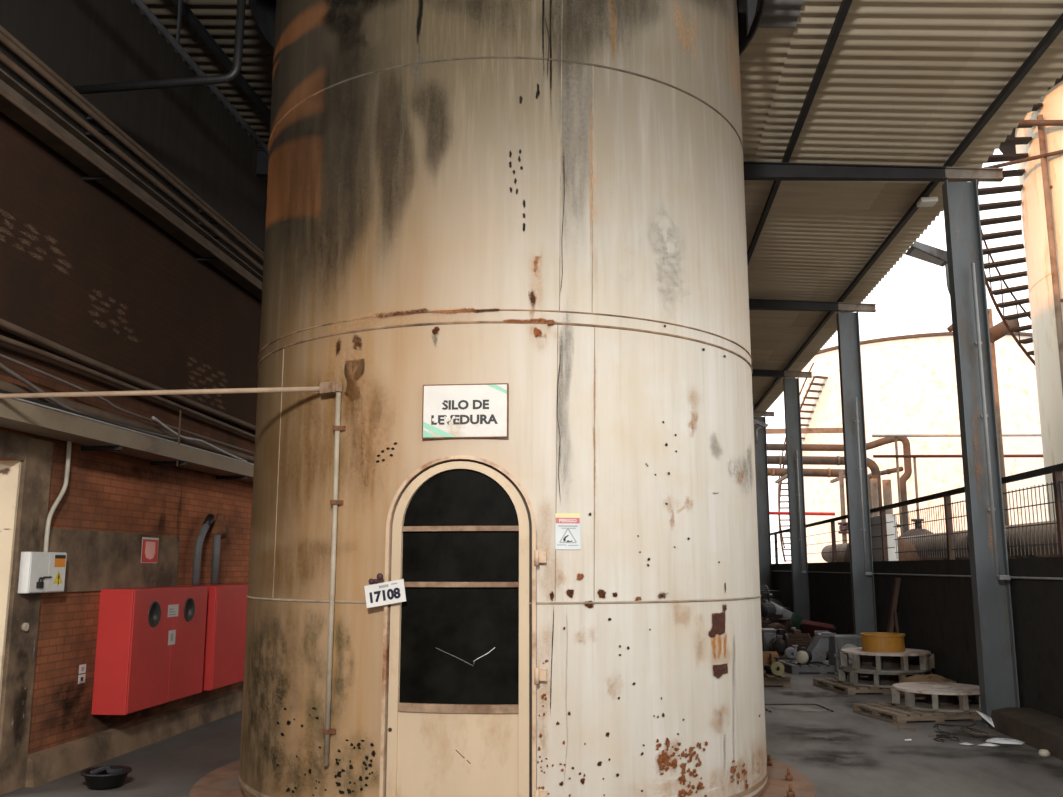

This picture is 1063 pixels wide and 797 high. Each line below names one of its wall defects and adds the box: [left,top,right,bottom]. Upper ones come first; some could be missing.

leakage [307,0,730,326]
corrosion [254,249,559,604]
leakage [555,296,575,513]
leakage [240,591,380,797]
corrosion [536,496,584,606]
corrosion [584,589,617,608]
corrosion [603,702,768,797]
corrosion [658,591,731,669]